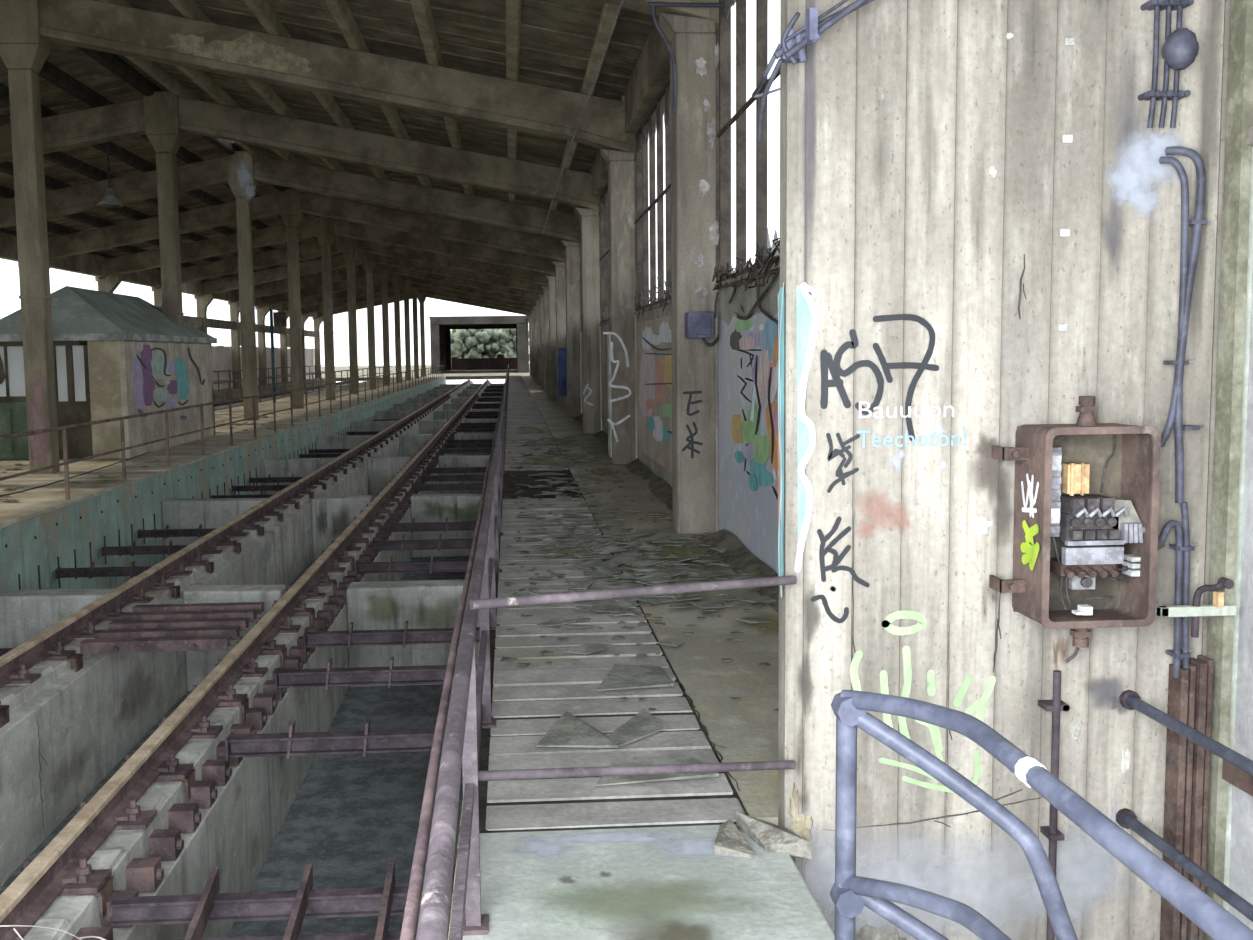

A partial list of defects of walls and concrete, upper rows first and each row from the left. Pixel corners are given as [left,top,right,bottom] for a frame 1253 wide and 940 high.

crack [666,660,740,791]
damp [638,923,702,940]